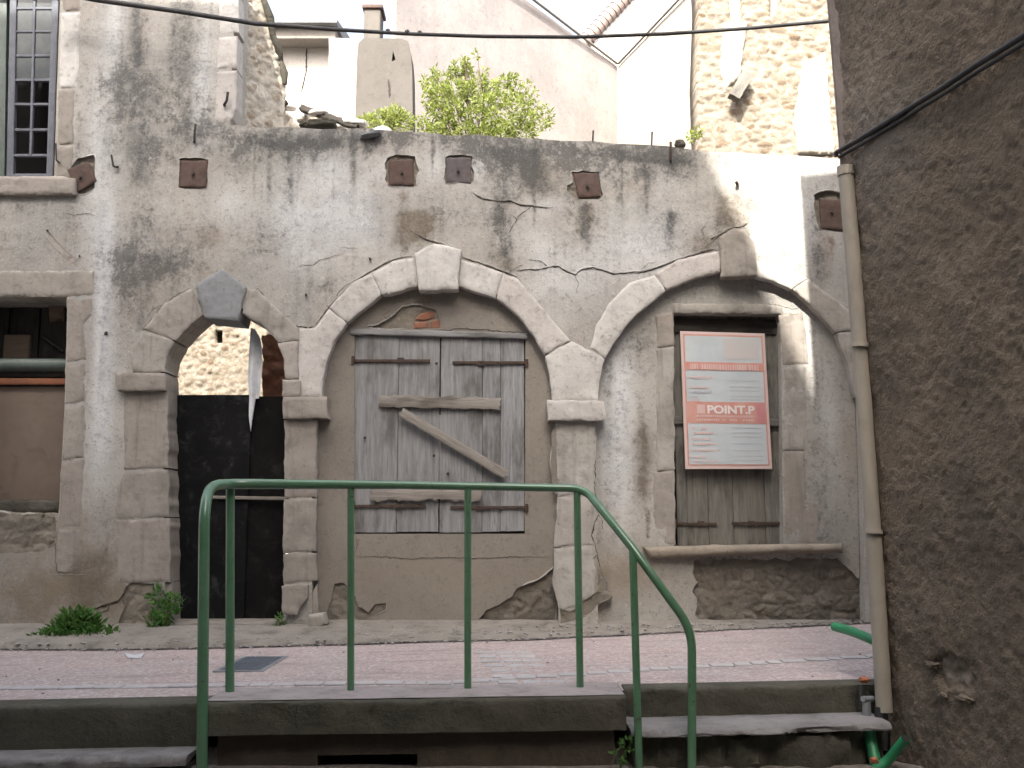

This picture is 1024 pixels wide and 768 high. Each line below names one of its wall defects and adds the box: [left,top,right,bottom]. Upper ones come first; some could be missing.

crack [472,190,550,233]
crack [286,214,747,328]
flaking render [119,583,154,624]
flaking render [327,583,387,620]
flaking render [480,566,613,623]
flaking render [691,556,860,620]